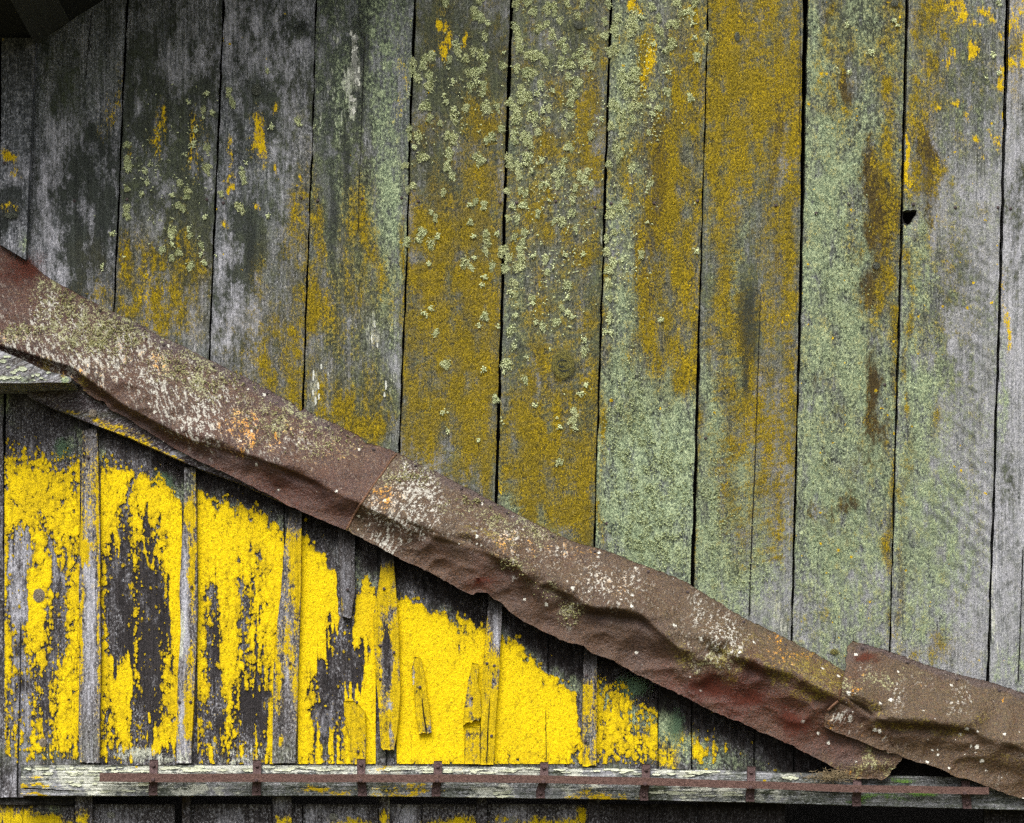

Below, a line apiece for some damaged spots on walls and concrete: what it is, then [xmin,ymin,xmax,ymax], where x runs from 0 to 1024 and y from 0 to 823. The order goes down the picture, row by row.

peeling [593,768,720,777]